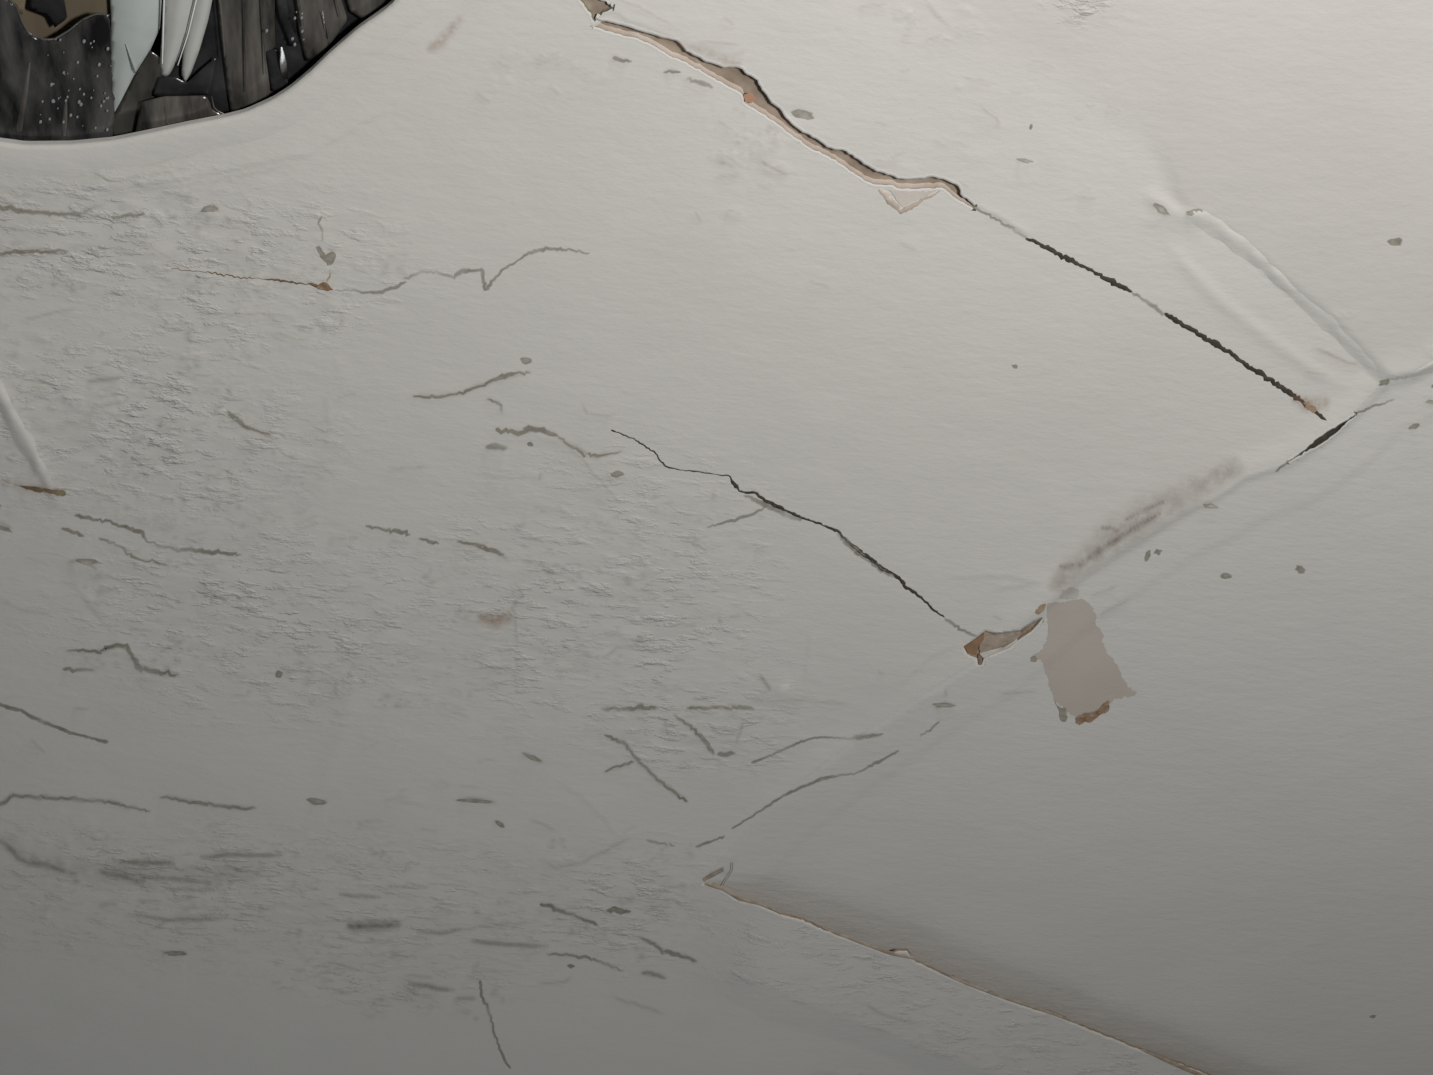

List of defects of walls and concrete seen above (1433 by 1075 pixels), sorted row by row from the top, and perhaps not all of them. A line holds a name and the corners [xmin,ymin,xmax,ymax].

crack [172,218,406,294]
crack [459,247,588,291]
crack [577,0,1382,472]
crack [368,526,502,555]
crack [414,372,975,636]
peeling [960,587,1137,725]